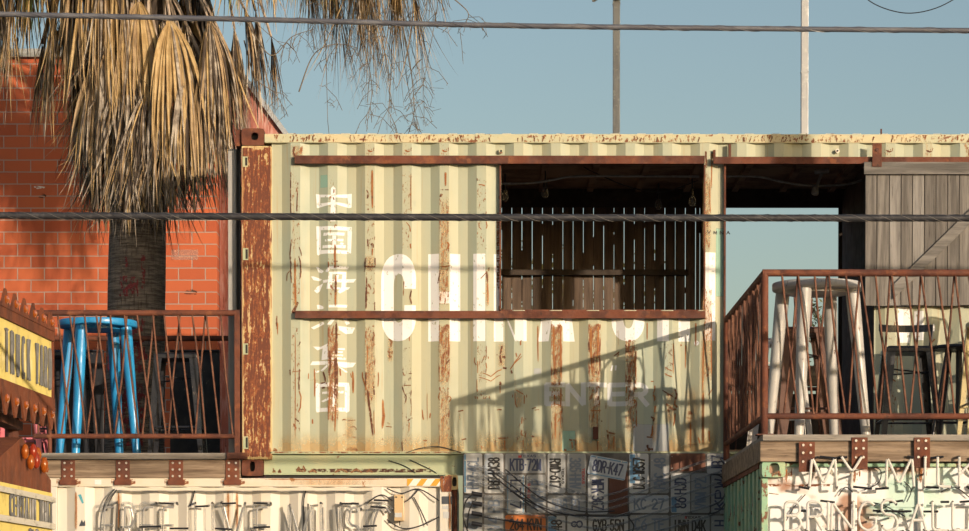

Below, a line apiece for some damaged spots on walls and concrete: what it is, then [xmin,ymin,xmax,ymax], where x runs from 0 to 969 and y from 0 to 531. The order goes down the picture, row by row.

rust [437,173,450,304]
rust [273,323,466,453]
rust [474,289,712,452]
rust [271,465,431,480]